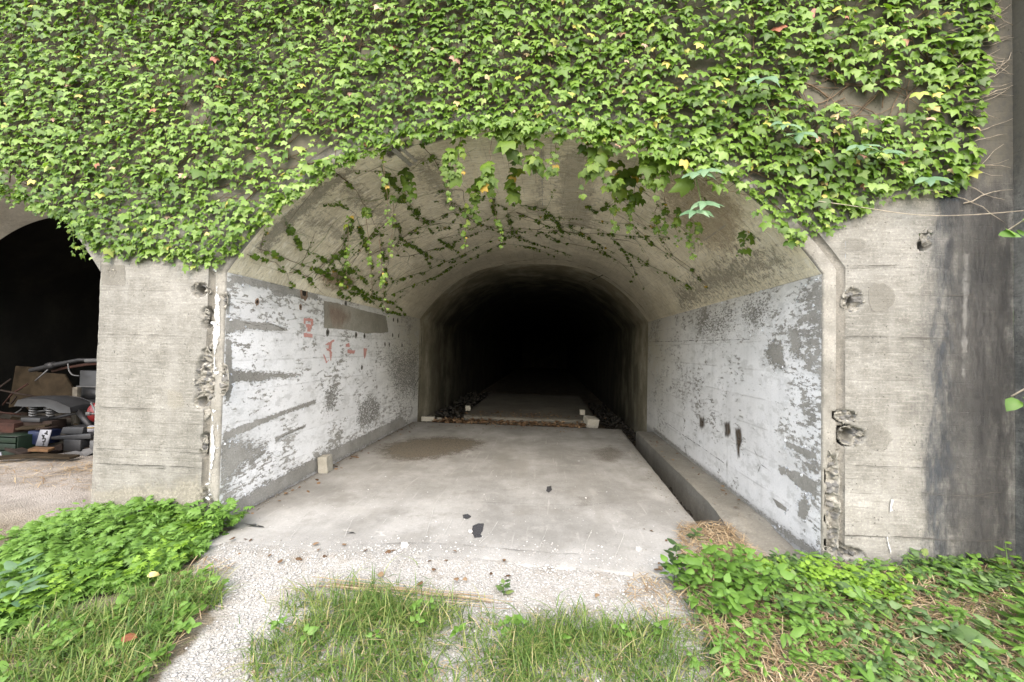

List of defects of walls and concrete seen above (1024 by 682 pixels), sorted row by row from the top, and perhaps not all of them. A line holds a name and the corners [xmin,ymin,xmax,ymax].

peeling [693,276,821,373]
spalling [840,285,865,313]
peeling [192,275,422,521]
water stain [372,438,484,460]
spalling [653,409,868,566]